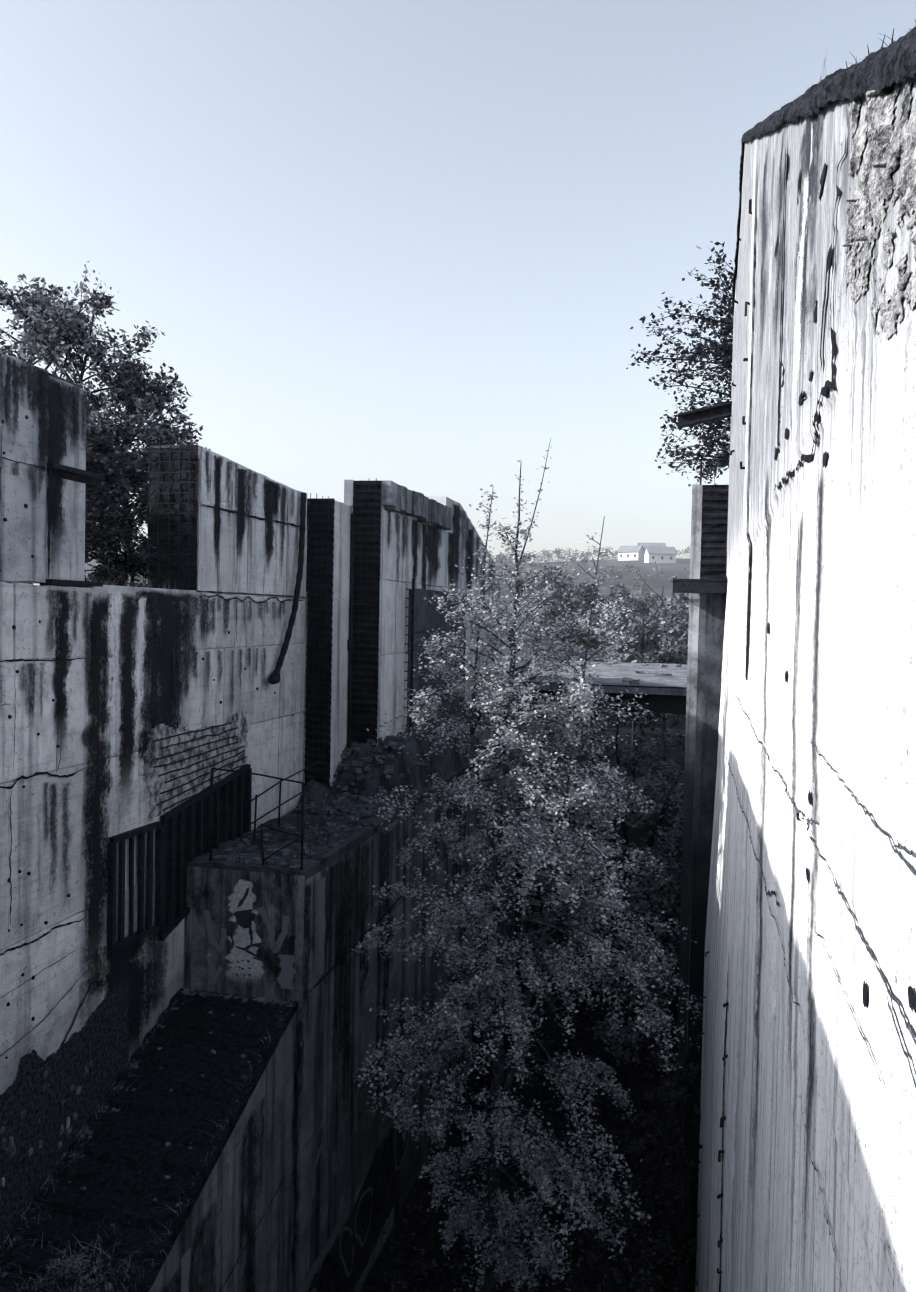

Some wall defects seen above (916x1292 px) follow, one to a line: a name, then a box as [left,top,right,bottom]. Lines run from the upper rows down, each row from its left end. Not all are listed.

spalling [842,77,916,341]
damp [0,353,89,537]
damp [205,451,295,566]
damp [388,505,500,608]
crack [722,135,916,1099]
crack [0,657,93,1056]
damp [21,590,286,1049]
spalling [144,710,249,824]
damp [291,822,400,1292]
damp [164,1099,265,1292]